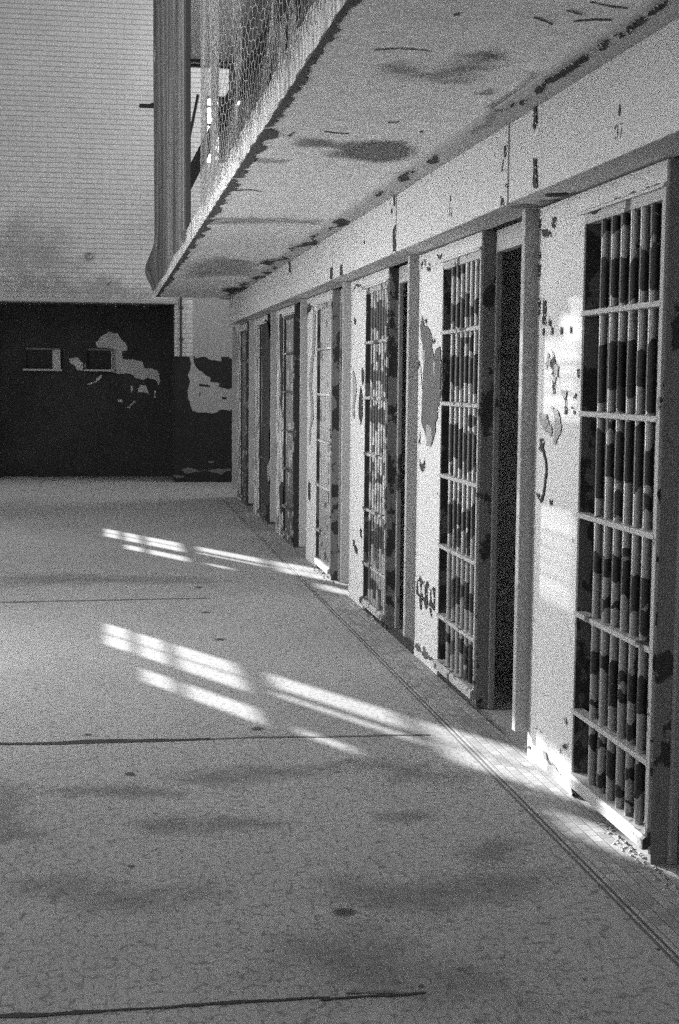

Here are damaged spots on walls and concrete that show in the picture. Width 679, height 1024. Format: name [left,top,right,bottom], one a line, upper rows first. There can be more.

damp [300,140,407,162]
peeling [451,264,466,279]
peeling [69,357,86,371]
peeling [88,332,160,408]
peeling [188,353,232,413]
peeling [352,299,387,432]
peeling [418,292,479,446]
peeling [539,351,576,445]
peeling [594,337,664,518]
peeling [353,520,384,555]
peeling [592,548,658,636]
peeling [589,649,656,741]